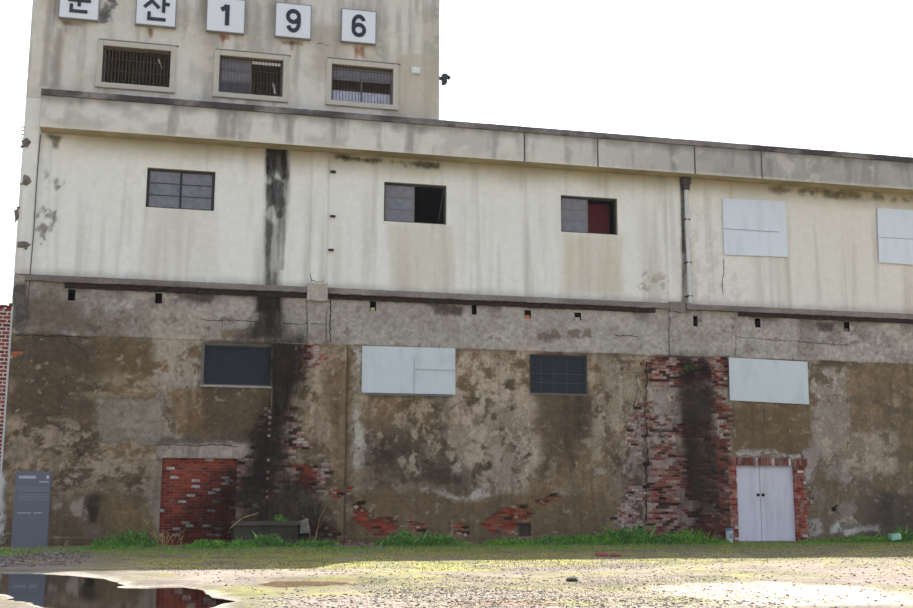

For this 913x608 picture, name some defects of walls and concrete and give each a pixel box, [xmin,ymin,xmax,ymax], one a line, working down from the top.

leakage [266,149,288,285]
flaking render [295,345,327,368]
leakage [187,296,326,541]
flaking render [236,407,352,511]
peeling [352,409,372,467]
leakage [682,360,715,535]
flaking render [590,357,899,540]
flaking render [353,505,425,535]
flaking render [481,497,561,535]